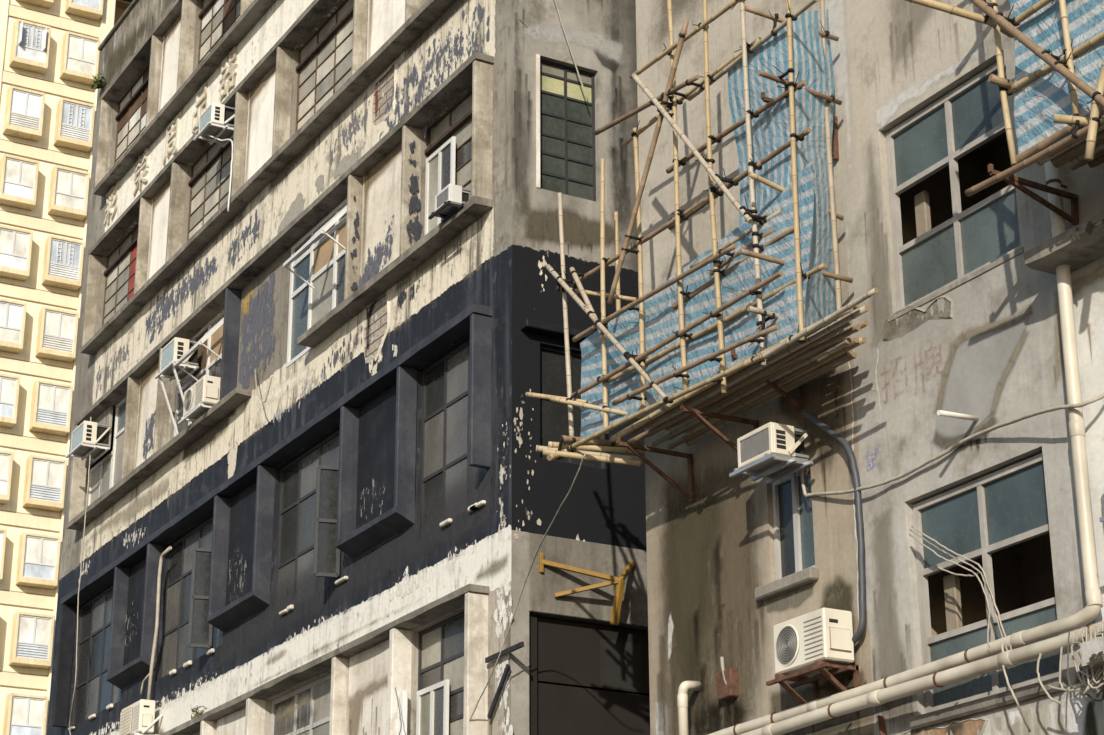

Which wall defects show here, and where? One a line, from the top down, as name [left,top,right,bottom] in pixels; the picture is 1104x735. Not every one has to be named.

peeling [330,3,491,167]
leakage [661,0,690,36]
peeling [406,88,468,246]
peeling [145,209,259,342]
peeling [350,196,394,292]
flaking render [273,280,420,423]
peeling [494,389,541,539]
leakage [656,468,812,735]
leakage [823,478,859,624]
leakage [874,515,904,680]
leakage [771,640,866,713]
leakage [881,696,912,735]